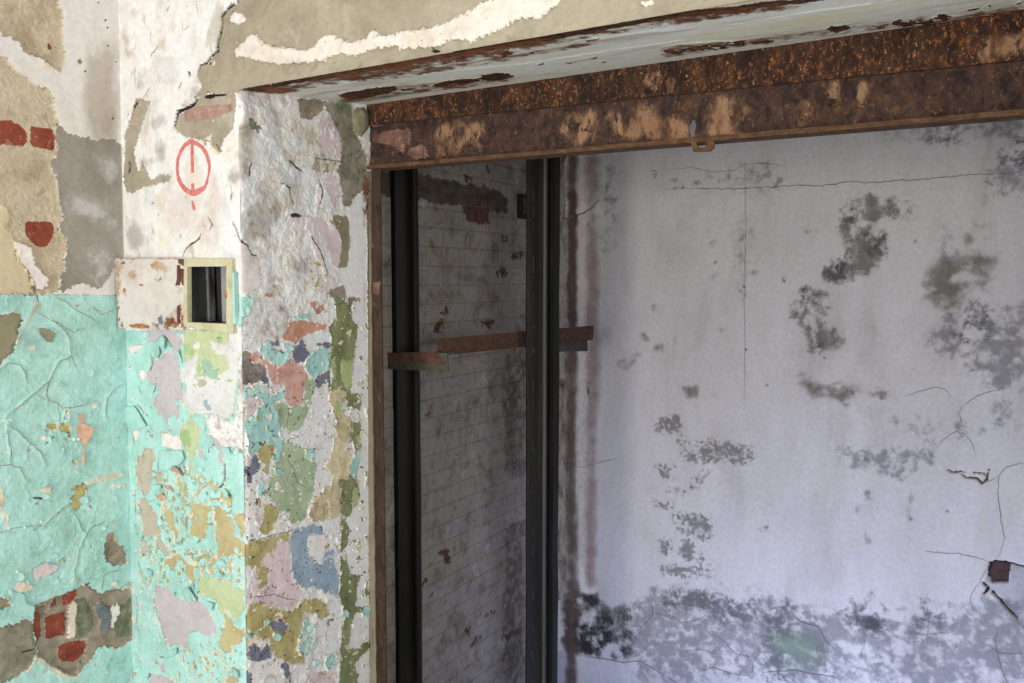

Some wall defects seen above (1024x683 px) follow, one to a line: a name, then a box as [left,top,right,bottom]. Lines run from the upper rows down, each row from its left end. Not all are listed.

spalling [0,0,86,72]
spalling [175,0,560,156]
rust [242,0,824,100]
rust [661,1,1024,57]
rust [369,124,430,159]
peeling [0,56,371,683]
water stain [791,289,841,352]
crack [662,151,1020,403]
water stain [823,194,898,281]
crack [0,262,123,581]
crack [907,387,1020,607]
water stain [561,593,631,658]